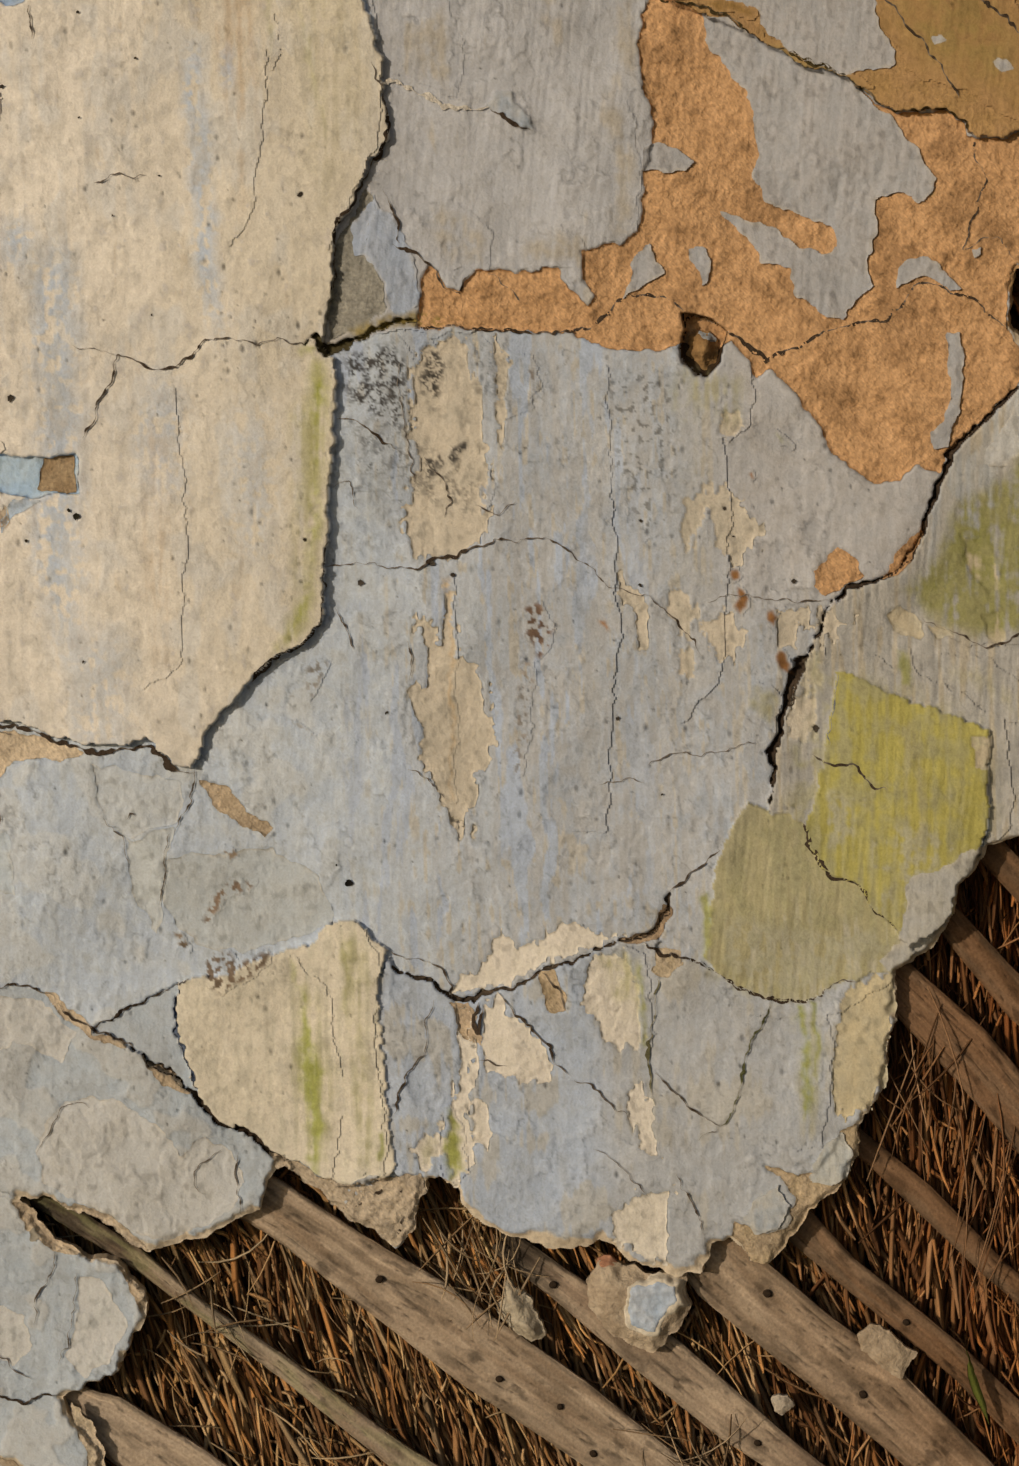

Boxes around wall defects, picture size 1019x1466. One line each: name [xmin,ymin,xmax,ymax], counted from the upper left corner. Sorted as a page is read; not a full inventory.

crack [74,274,683,437]
crack [252,363,699,682]
peeling [326,0,1019,840]
crack [600,386,1019,802]
flaking render [12,1202,80,1255]
crack [0,723,195,905]
crack [0,979,279,1215]
peeling [35,1095,244,1251]
peeling [0,730,334,997]
peeling [269,904,683,1247]
crack [392,851,860,1140]
flaking render [732,848,982,1265]